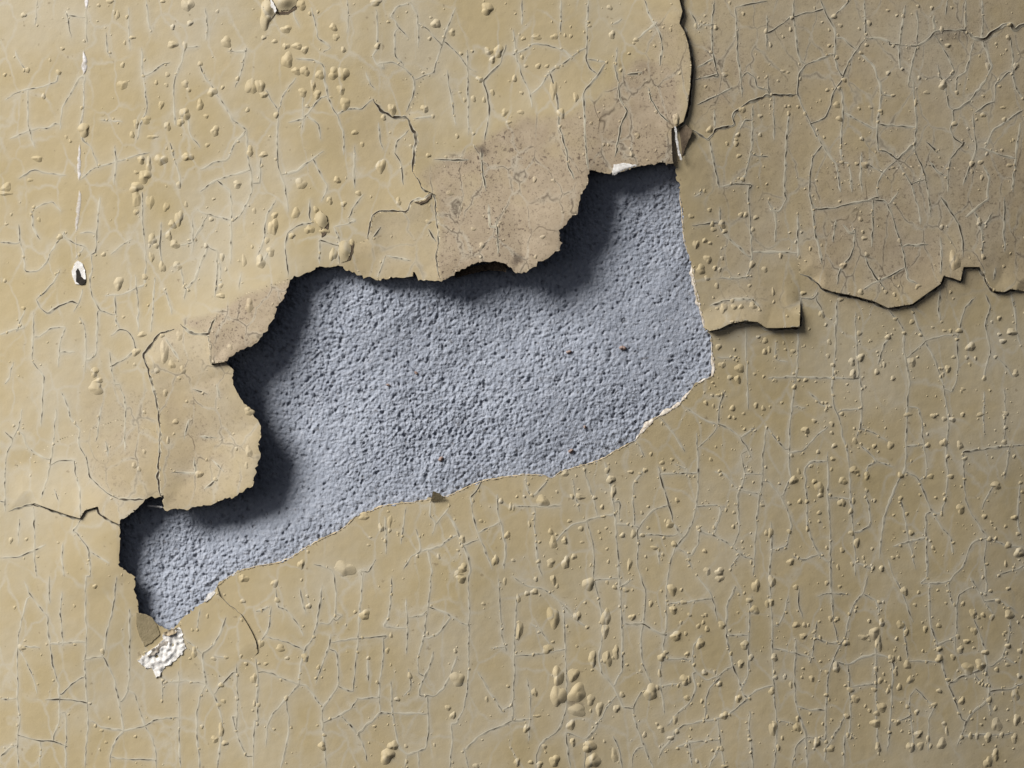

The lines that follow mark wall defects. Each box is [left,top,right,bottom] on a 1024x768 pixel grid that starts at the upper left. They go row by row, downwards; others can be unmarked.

crack [5,0,209,185]
crack [180,66,262,299]
crack [258,0,642,282]
crack [638,0,664,66]
crack [648,0,1024,290]
peeling [9,0,800,680]
crack [0,192,1024,768]